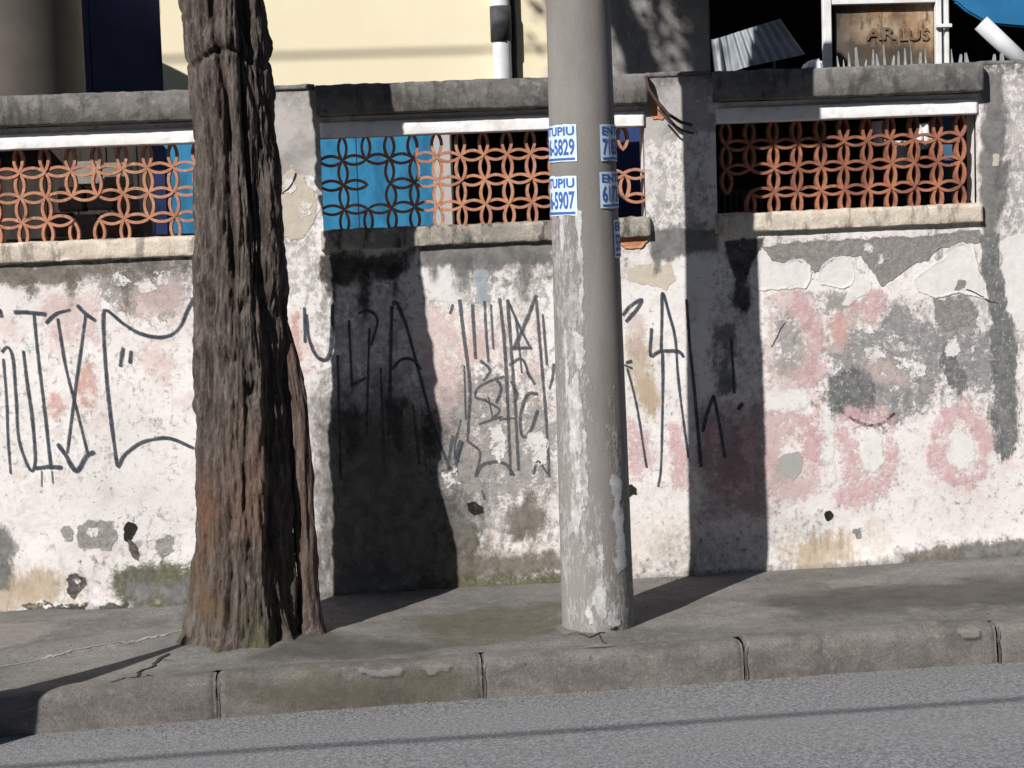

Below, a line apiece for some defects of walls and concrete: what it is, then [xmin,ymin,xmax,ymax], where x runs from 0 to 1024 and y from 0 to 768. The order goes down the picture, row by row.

peeling [281,169,317,240]
peeling [627,263,676,291]
peeling [758,229,999,487]
peeling [412,210,637,633]
spalling [60,520,139,561]
spalling [22,573,129,610]
damp [122,563,189,606]